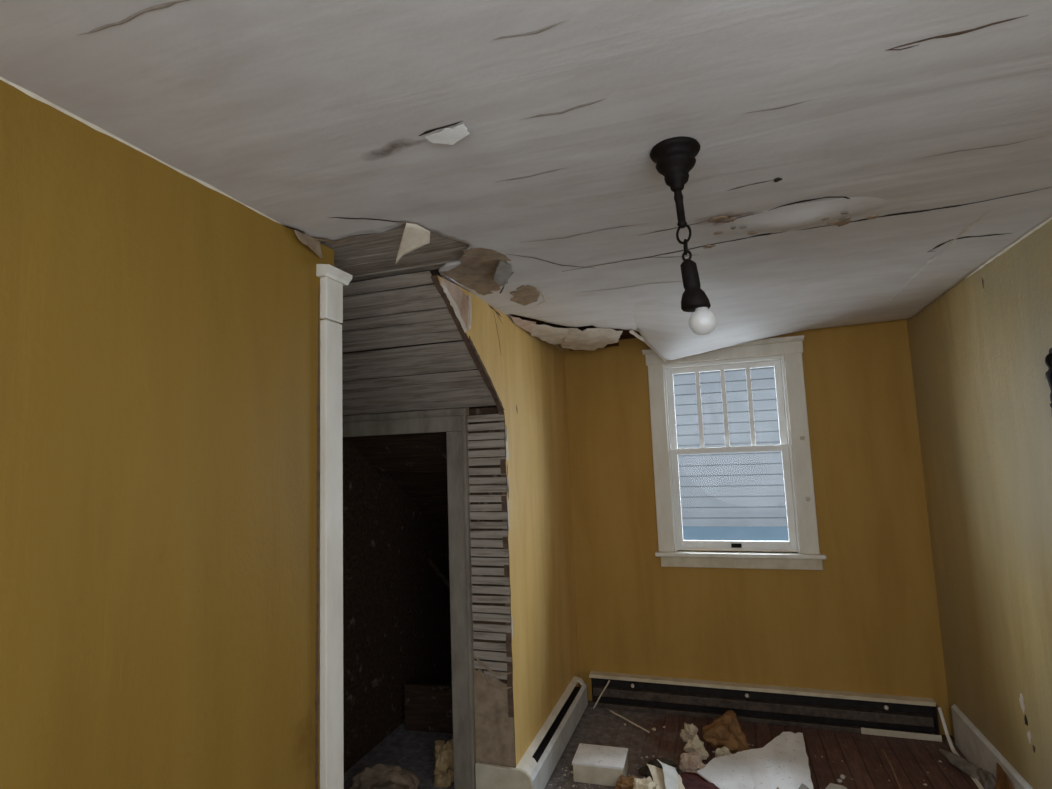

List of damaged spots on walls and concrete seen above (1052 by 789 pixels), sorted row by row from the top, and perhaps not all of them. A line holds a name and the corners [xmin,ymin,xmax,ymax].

crack [888,15,1029,50]
peeling [419,121,469,145]
spalling [283,225,355,259]
flaking render [333,217,430,265]
crack [509,178,1051,272]
flaking render [441,248,546,307]